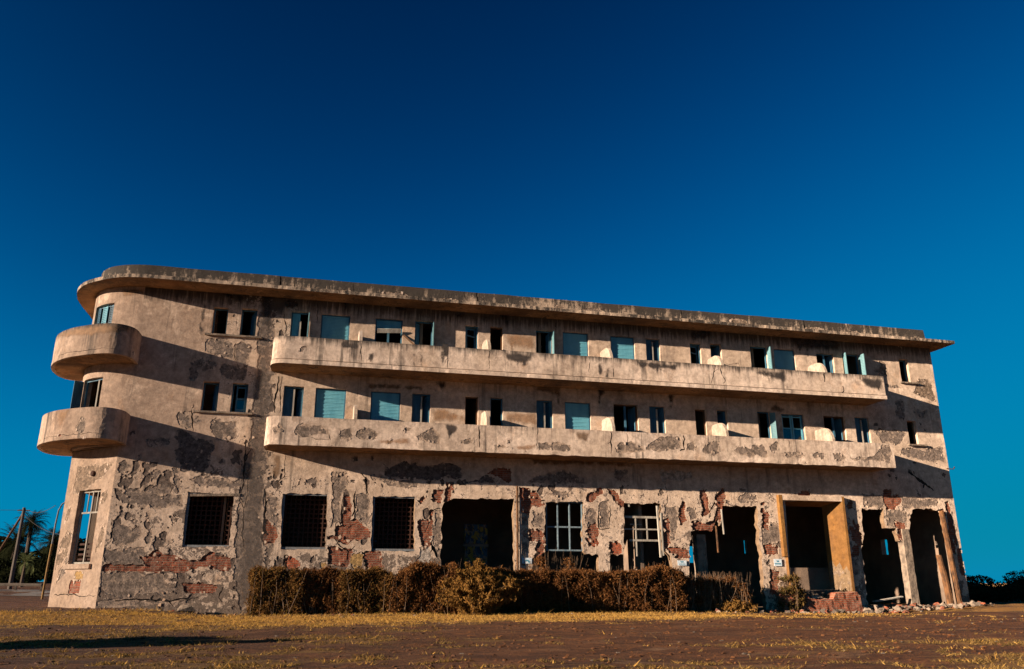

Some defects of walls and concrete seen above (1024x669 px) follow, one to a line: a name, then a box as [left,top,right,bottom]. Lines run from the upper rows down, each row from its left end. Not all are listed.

peeling [55,311,629,611]
peeling [615,436,720,456]
peeling [658,488,781,596]
peeling [734,361,966,591]